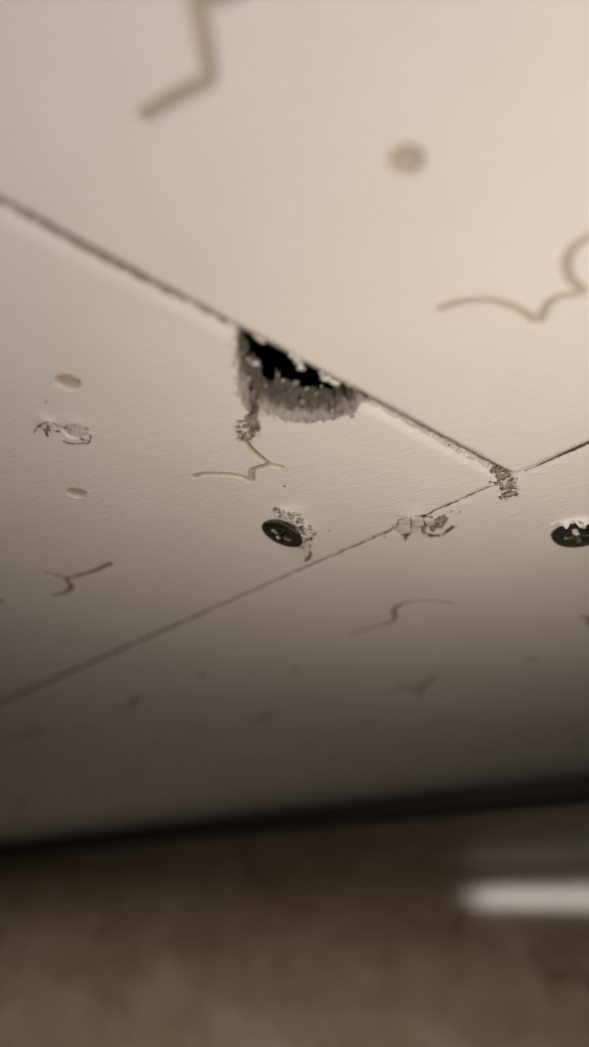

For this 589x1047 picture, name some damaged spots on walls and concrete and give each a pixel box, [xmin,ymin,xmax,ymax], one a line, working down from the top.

hole [228,326,372,425]
spalling [34,421,93,445]
crack [235,389,269,469]
spalling [490,465,520,500]
peeling [276,508,317,562]
spalling [377,511,464,540]
peeling [549,511,589,529]